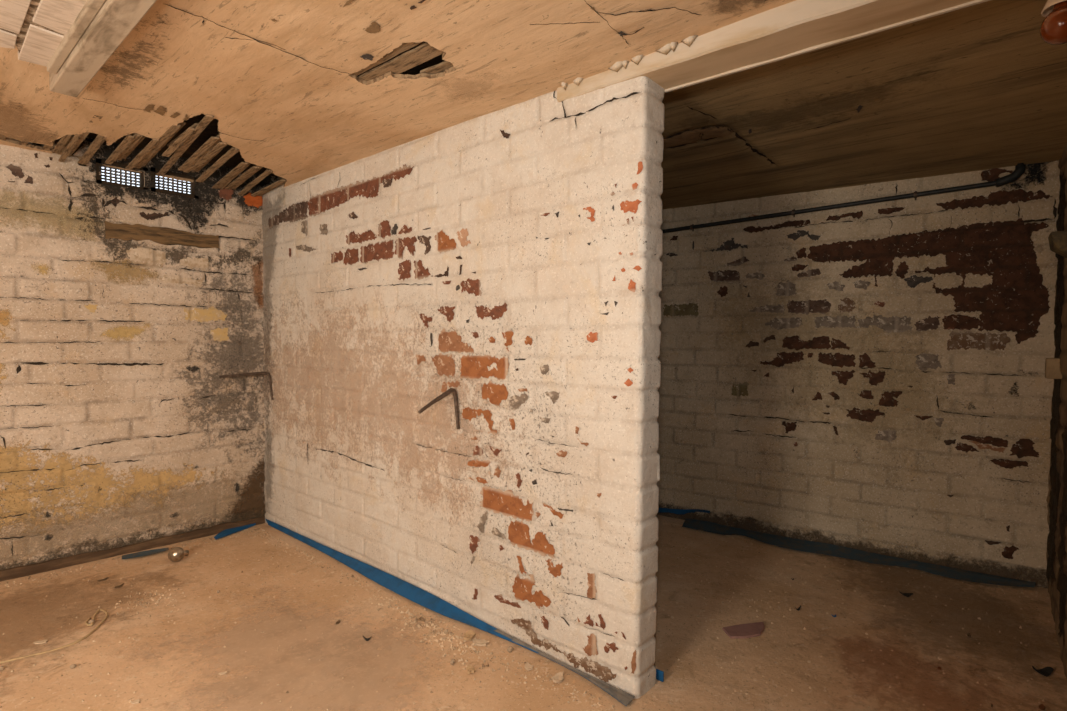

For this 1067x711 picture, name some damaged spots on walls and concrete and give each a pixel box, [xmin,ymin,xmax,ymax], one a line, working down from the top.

crack [530,0,699,44]
spalling [349,41,456,85]
flaking render [0,104,287,208]
crack [551,91,642,124]
crack [663,106,775,164]
peeling [610,161,643,226]
flaking render [936,168,1053,210]
flaking render [692,214,1051,442]
water stain [186,302,259,423]
peeling [268,164,636,683]
peeling [944,435,1039,469]
water stain [0,438,266,570]